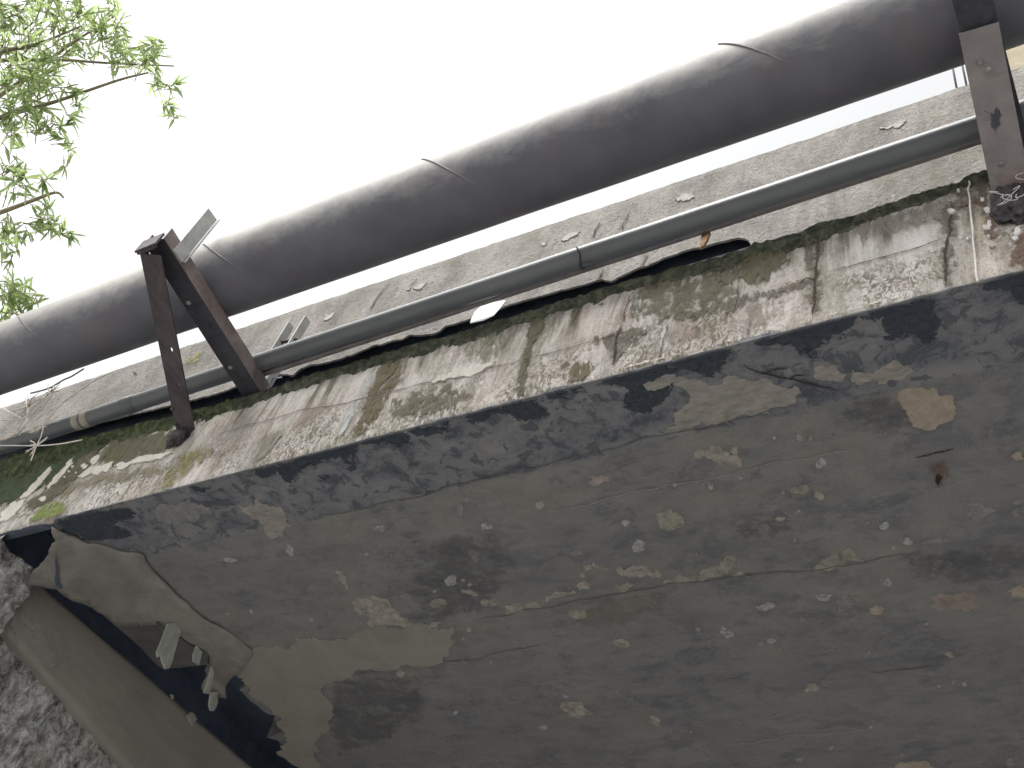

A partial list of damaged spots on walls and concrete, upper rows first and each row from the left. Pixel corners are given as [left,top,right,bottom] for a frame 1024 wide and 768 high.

crack [800,204,953,317]
leakage [465,317,594,424]
peeling [643,373,802,433]
crack [743,365,835,390]
peeling [813,360,957,431]
leakage [24,448,166,509]
peeling [693,445,743,468]
leakage [58,508,136,541]
peeling [655,509,686,531]
spalling [335,567,441,629]